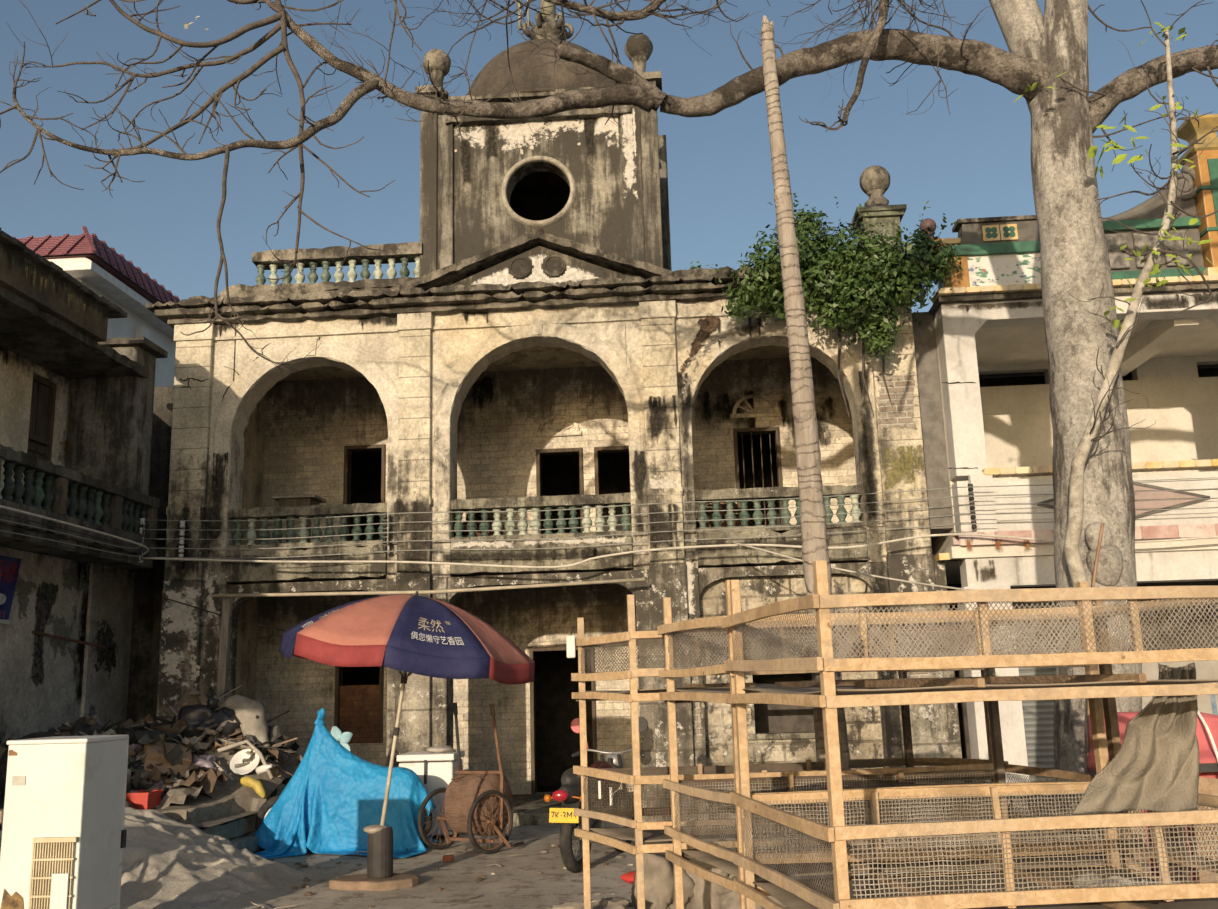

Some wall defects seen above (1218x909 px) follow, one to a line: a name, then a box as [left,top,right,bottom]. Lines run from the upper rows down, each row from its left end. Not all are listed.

peeling [454,105,638,198]
damp [471,378,494,409]
damp [647,373,755,445]
damp [779,401,795,448]
damp [816,398,833,445]
damp [898,447,924,480]
damp [394,497,429,581]
damp [442,451,690,568]
damp [692,537,802,554]
damp [74,563,88,703]